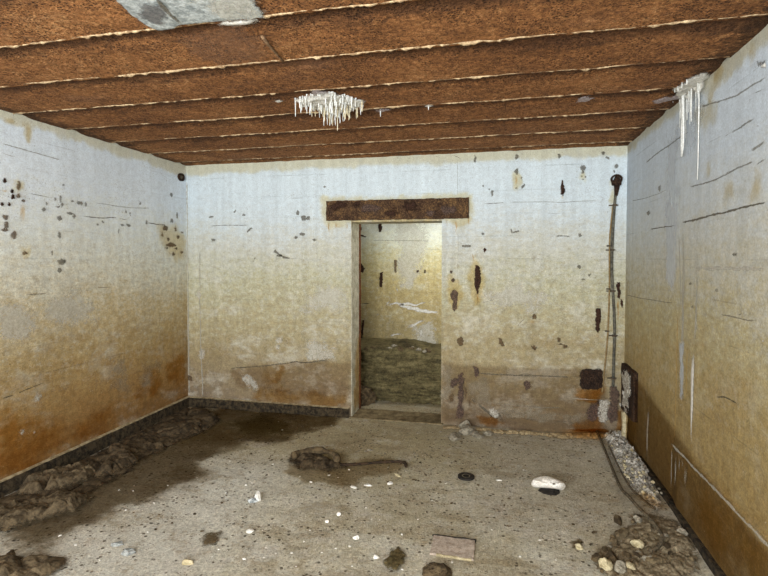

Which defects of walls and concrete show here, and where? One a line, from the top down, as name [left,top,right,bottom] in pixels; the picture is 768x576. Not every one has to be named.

spalling [116,0,263,30]
corrosion [449,373,470,419]
corrosion [586,386,620,423]